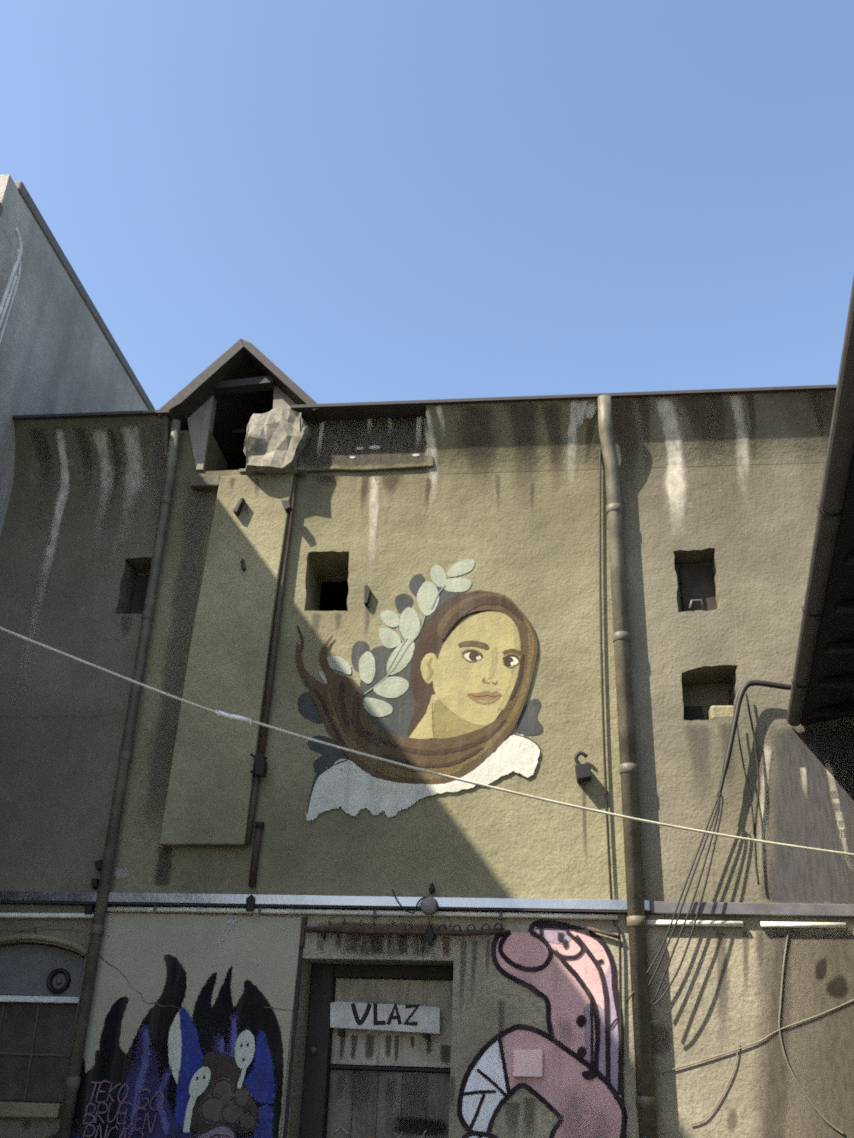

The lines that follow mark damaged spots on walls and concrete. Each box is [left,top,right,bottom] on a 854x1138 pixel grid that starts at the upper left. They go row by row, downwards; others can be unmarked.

leakage [32,428,141,567]
leakage [304,406,444,540]
leakage [514,401,596,460]
leakage [615,395,755,509]
corrosion [300,917,505,954]